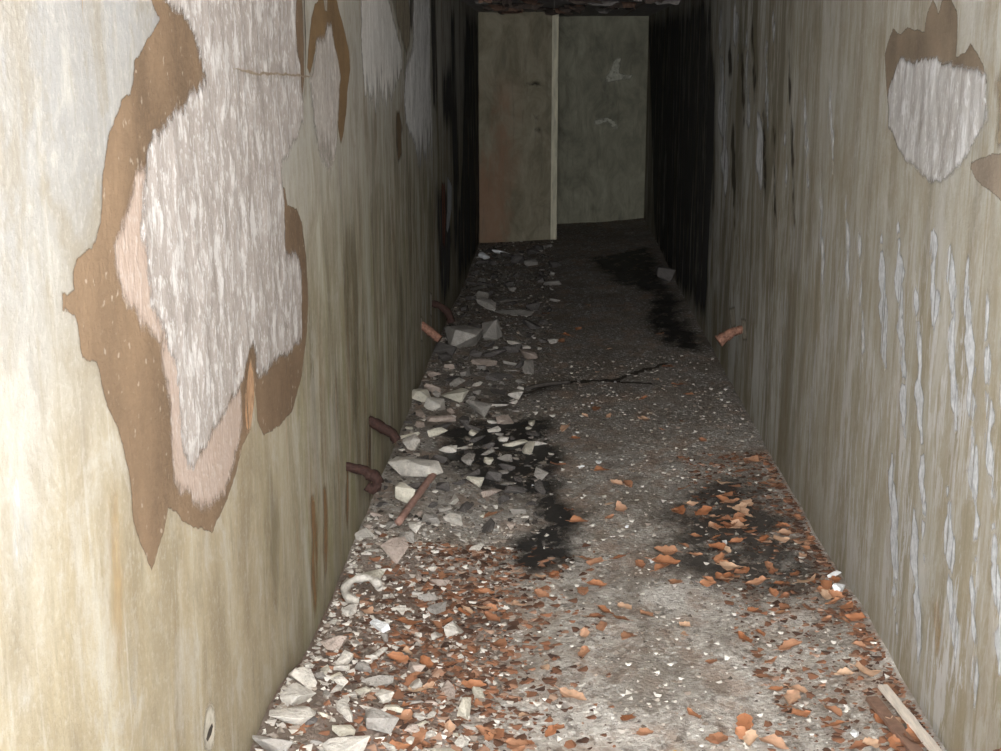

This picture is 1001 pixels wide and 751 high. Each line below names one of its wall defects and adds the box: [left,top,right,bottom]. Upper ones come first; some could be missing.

peeling [361,0,432,156]
peeling [475,0,681,15]
peeling [885,0,1001,201]
peeling [62,0,350,569]
corrosion [715,326,743,347]
corrosion [346,416,401,524]